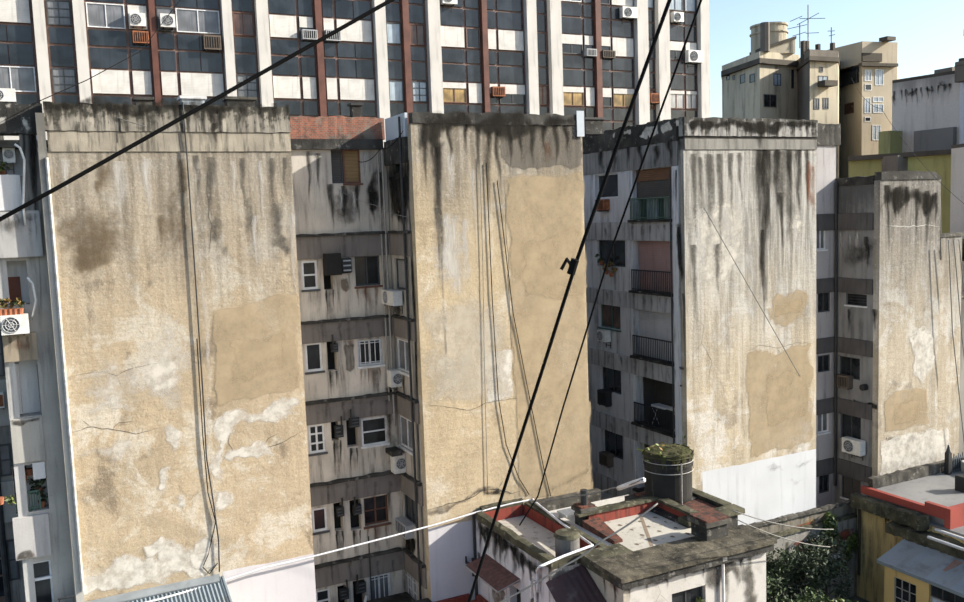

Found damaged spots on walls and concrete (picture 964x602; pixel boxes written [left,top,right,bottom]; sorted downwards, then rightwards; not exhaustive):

water stain [464,124,569,172]
water stain [328,160,411,231]
water stain [422,124,466,285]
water stain [677,121,809,304]
water stain [884,185,937,228]
crack [76,419,157,434]
flaking render [210,398,298,477]
flaking render [215,492,233,510]
crack [427,481,520,511]
flaking render [83,536,221,595]
water stain [478,522,537,580]
water stain [685,557,757,602]